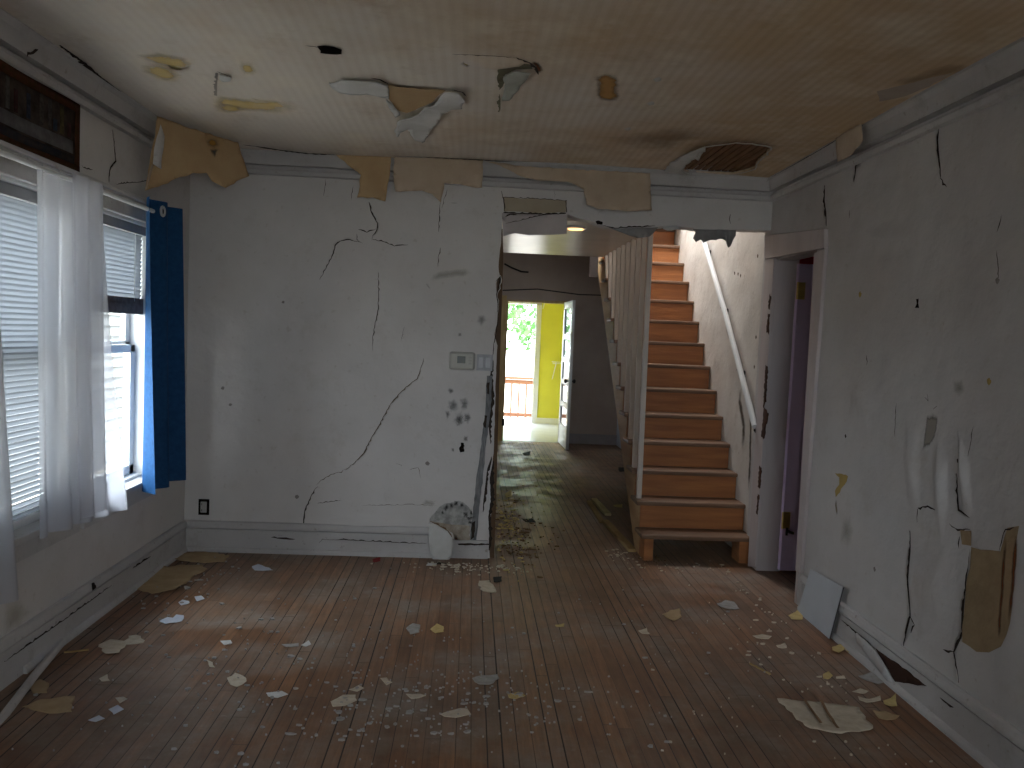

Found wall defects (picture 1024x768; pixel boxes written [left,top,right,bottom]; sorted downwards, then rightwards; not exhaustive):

peeling [454,51,541,112]
crack [83,130,147,185]
peeling [664,147,706,174]
crack [935,129,947,187]
crack [319,188,403,280]
crack [372,273,380,349]
crack [272,359,436,544]
flaking render [426,501,474,566]
crack [902,429,973,646]
flaking render [960,526,1019,653]
crack [941,589,965,708]